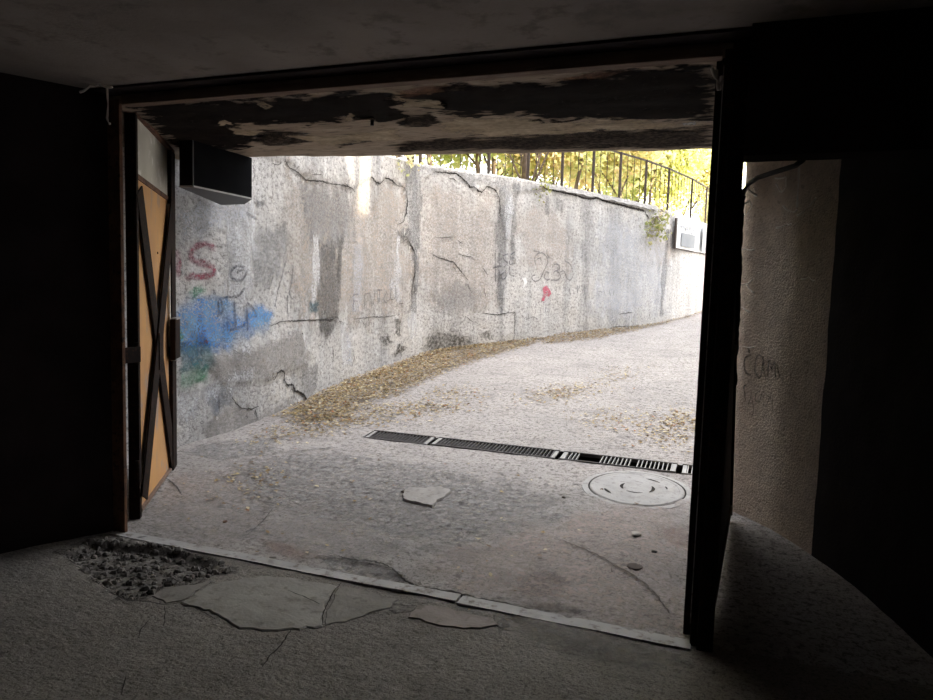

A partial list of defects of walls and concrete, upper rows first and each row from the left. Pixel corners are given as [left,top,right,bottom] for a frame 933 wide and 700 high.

peeling [399,98,444,109]
peeling [218,120,262,136]
peeling [440,117,702,138]
leakage [304,186,346,336]
crack [271,161,515,336]
crack [274,370,307,400]
spalling [55,535,237,600]
crack [288,583,386,625]
crack [262,630,291,667]